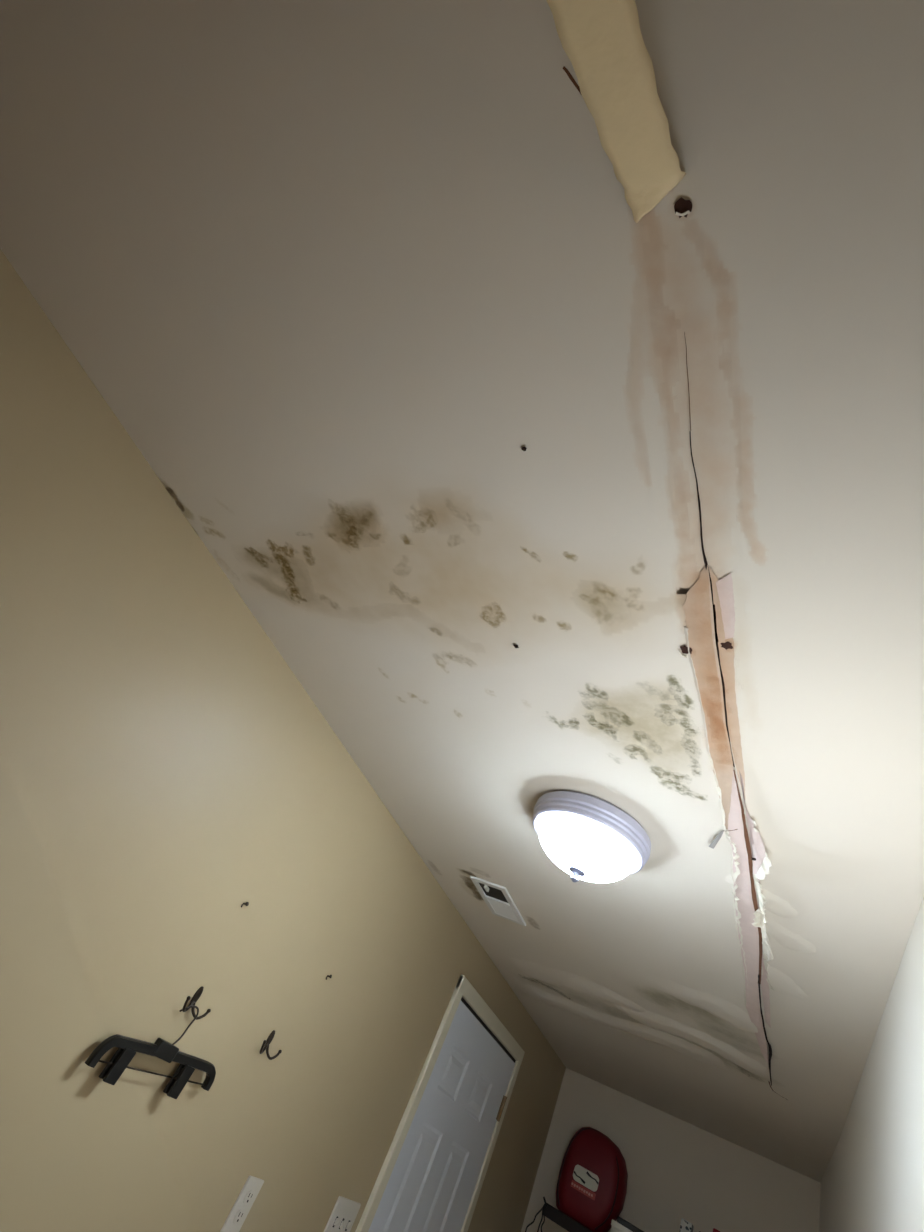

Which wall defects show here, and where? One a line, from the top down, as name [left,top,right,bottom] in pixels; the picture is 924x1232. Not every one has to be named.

peeling [684,627,775,1006]
crack [684,332,784,1098]